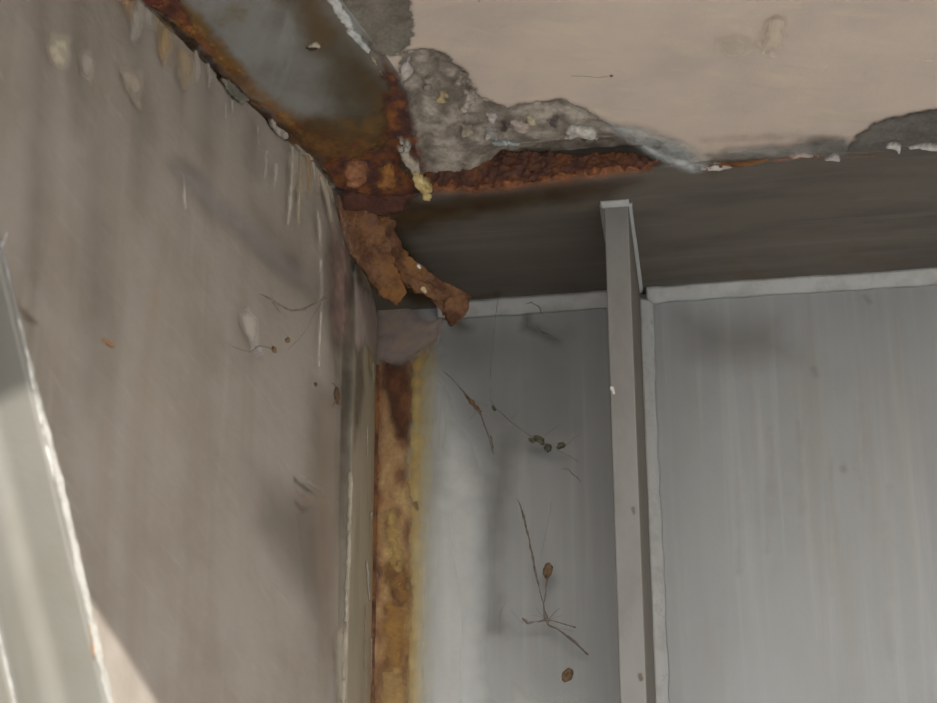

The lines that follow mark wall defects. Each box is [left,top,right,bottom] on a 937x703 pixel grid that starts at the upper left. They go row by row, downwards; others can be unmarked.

spalling [271,118,314,161]
spalling [342,0,695,173]
spalling [843,110,937,153]
corrosion [139,0,607,703]